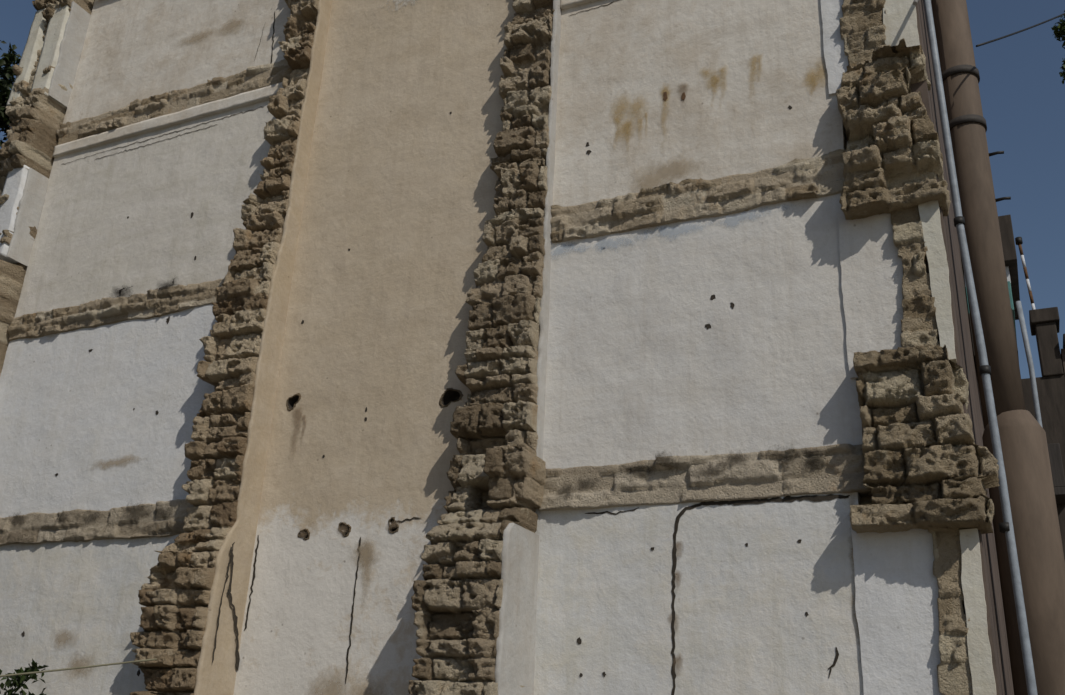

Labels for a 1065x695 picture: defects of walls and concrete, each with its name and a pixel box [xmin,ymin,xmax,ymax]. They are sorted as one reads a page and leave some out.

spalling [286,393,301,411]
hole [439,388,464,408]
spalling [339,522,351,537]
spalling [388,517,399,533]
crack [212,535,259,670]
crack [345,537,361,684]
crack [671,494,850,695]